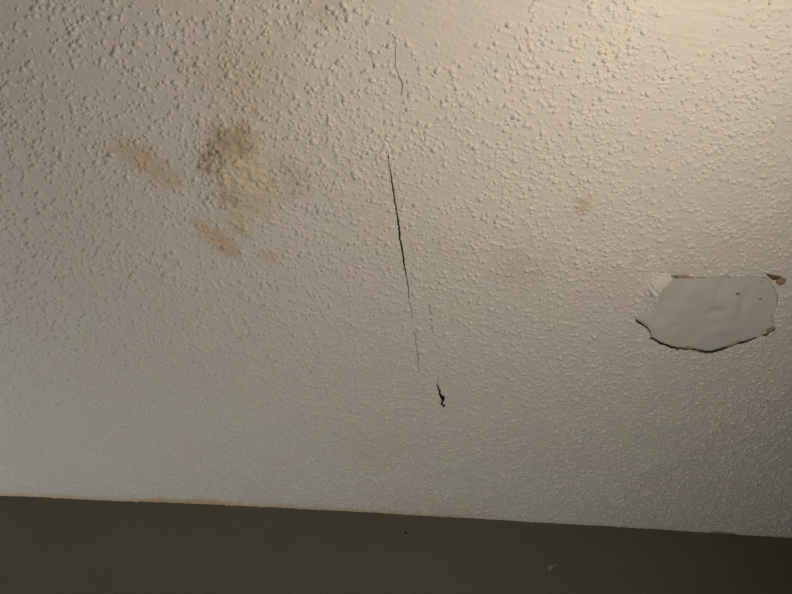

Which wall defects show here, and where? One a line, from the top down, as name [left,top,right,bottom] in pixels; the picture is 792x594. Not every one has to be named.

leakage [100,0,359,267]
crack [388,155,433,368]
crack [437,377,445,408]
peeling [632,271,786,353]